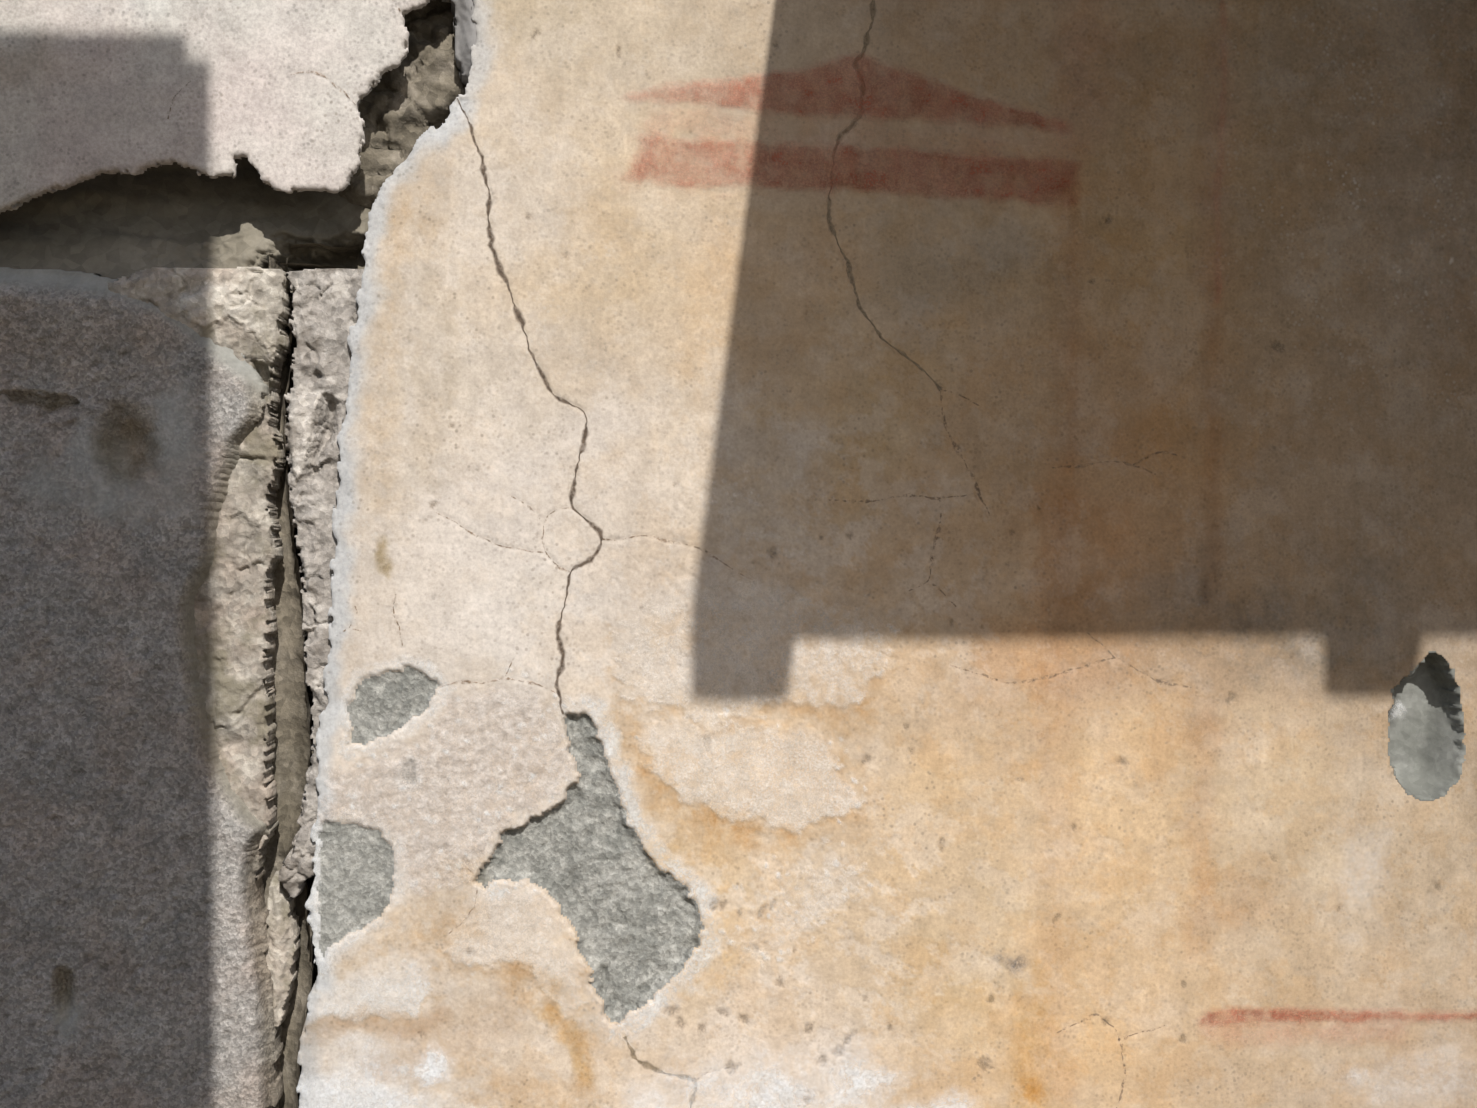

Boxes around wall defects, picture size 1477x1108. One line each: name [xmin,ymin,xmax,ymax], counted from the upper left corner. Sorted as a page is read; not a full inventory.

crack [442,98,742,714]
crack [827,0,989,607]
crack [262,243,360,1108]
flaking render [316,822,394,957]
flaking render [347,666,440,745]
flaking render [476,701,717,1034]
crack [623,1036,729,1108]
crack [1057,1014,1161,1101]